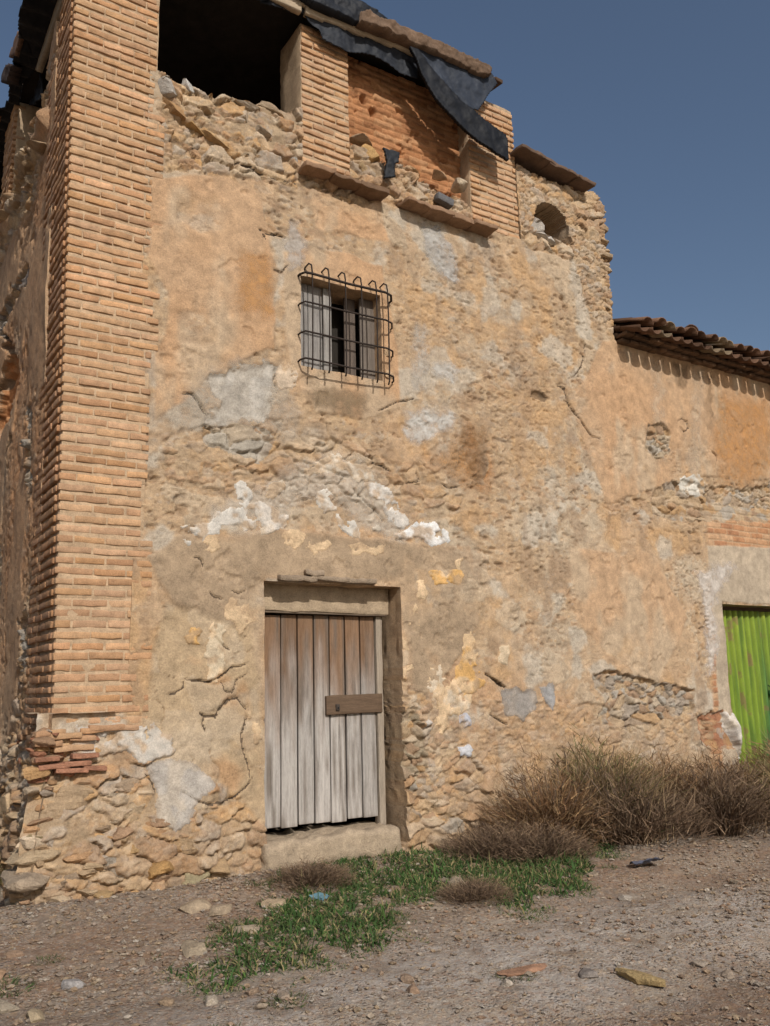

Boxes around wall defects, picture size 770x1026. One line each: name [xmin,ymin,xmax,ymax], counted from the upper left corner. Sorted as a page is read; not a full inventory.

spalling [0,377,16,392]
spalling [183,358,298,464]
crack [557,344,599,439]
peeling [180,480,332,555]
peeling [302,453,451,556]
spalling [650,480,770,524]
peeling [409,557,464,626]
spalling [68,722,216,832]
crack [169,646,253,806]
spalling [400,631,556,834]
spalling [592,670,735,750]